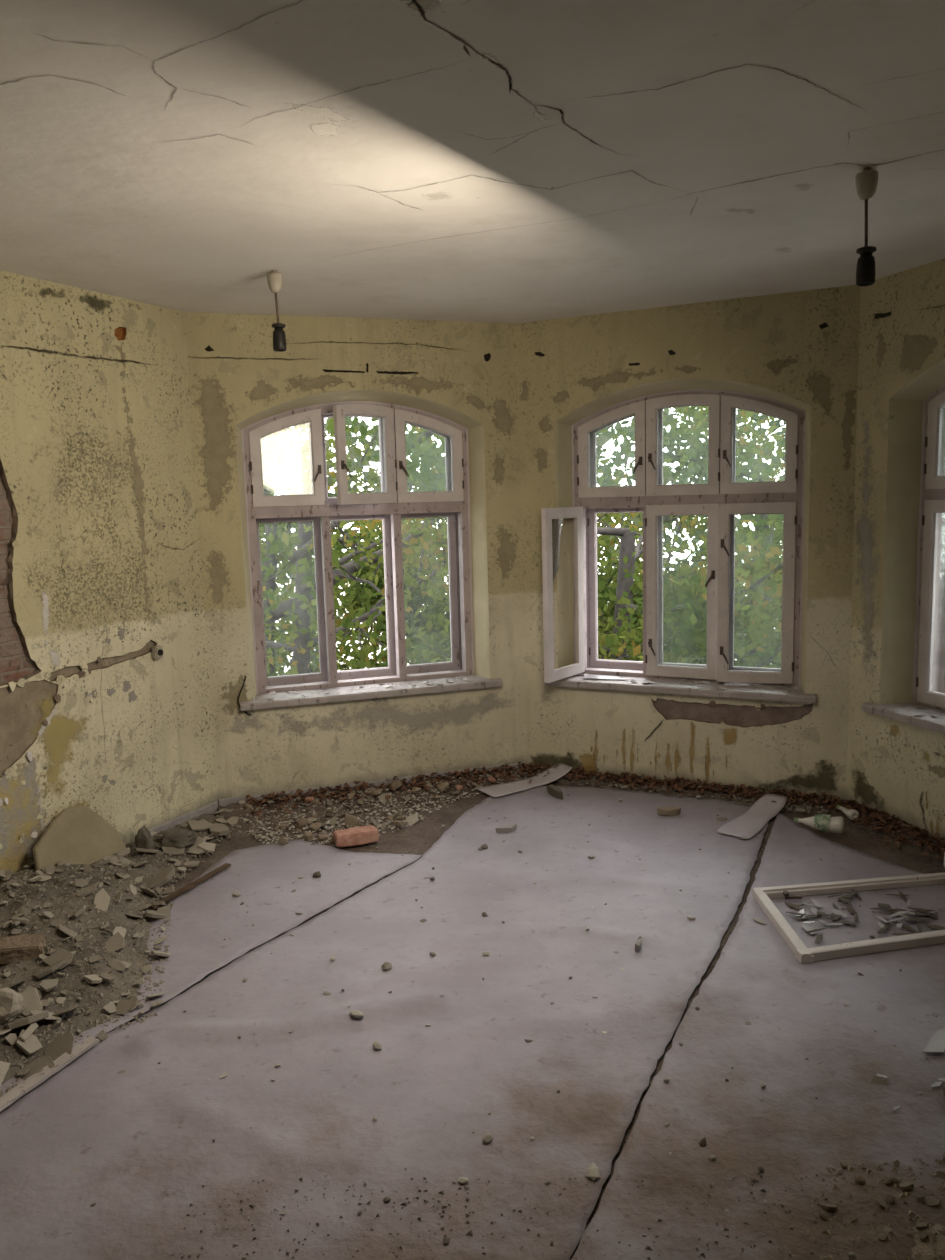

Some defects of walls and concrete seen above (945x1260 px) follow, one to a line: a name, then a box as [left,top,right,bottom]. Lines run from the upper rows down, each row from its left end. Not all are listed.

crack [408,0,600,146]
crack [611,68,731,95]
crack [762,66,826,90]
damp [193,374,236,514]
damp [28,425,150,634]
damp [204,550,230,610]
flaking render [0,459,138,873]
peeling [385,677,481,688]
flaking render [605,676,813,728]